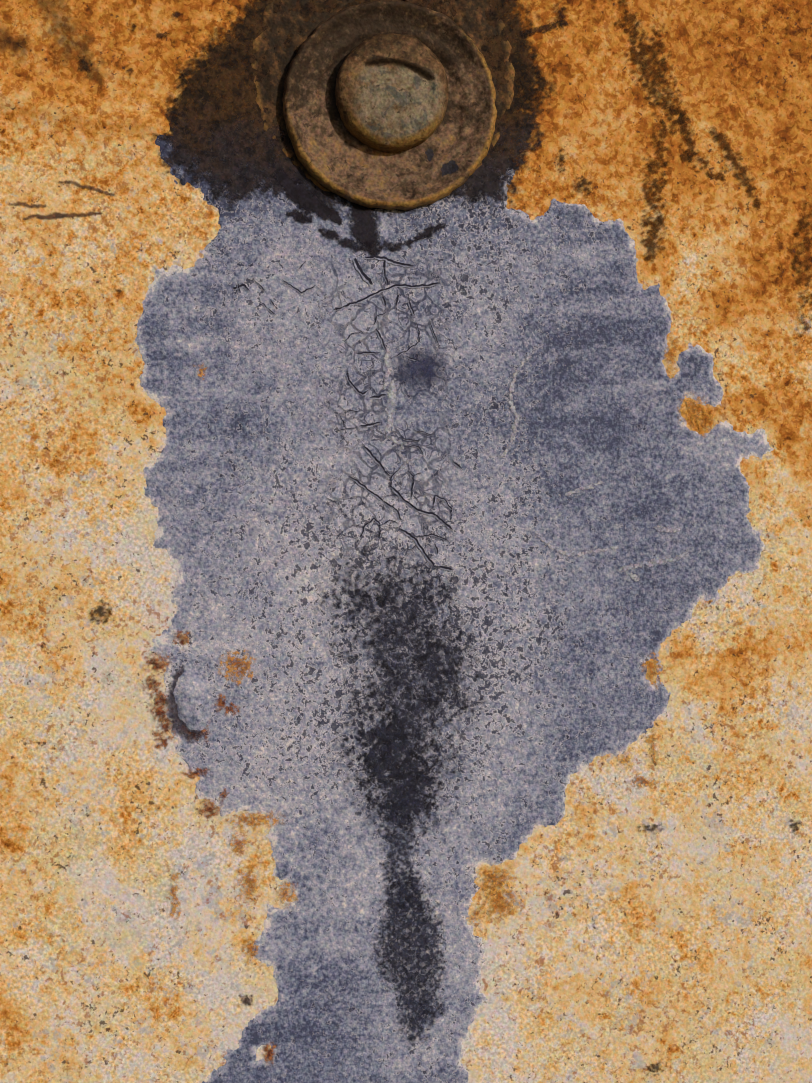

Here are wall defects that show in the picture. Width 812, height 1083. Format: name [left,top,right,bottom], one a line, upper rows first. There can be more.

rust [615,0,761,262]
leakage [271,169,446,259]
crack [233,261,317,315]
rust [793,203,812,345]
crack [335,255,454,571]
rust [145,656,174,748]
rust [218,694,239,714]
rust [221,650,253,685]
rust [199,789,277,854]
leakage [321,548,480,1046]
rust [170,873,181,916]
rust [264,1044,276,1062]